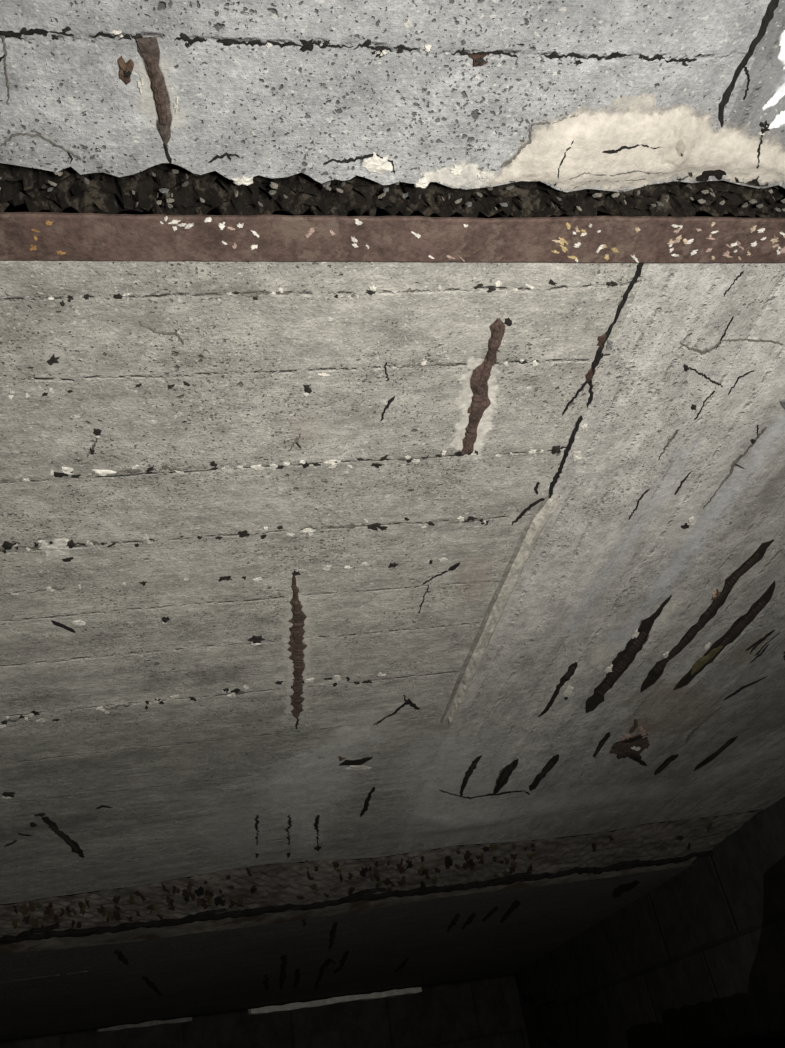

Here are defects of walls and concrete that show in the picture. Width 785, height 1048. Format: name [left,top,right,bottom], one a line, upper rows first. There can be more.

peeling [0,27,27,38]
crack [718,0,779,127]
spalling [0,30,785,262]
crack [512,263,644,542]
spalling [538,593,680,717]
spalling [640,539,776,692]
spalling [459,755,482,797]
spalling [493,759,519,794]
spalling [529,754,559,791]
spalling [593,719,679,775]